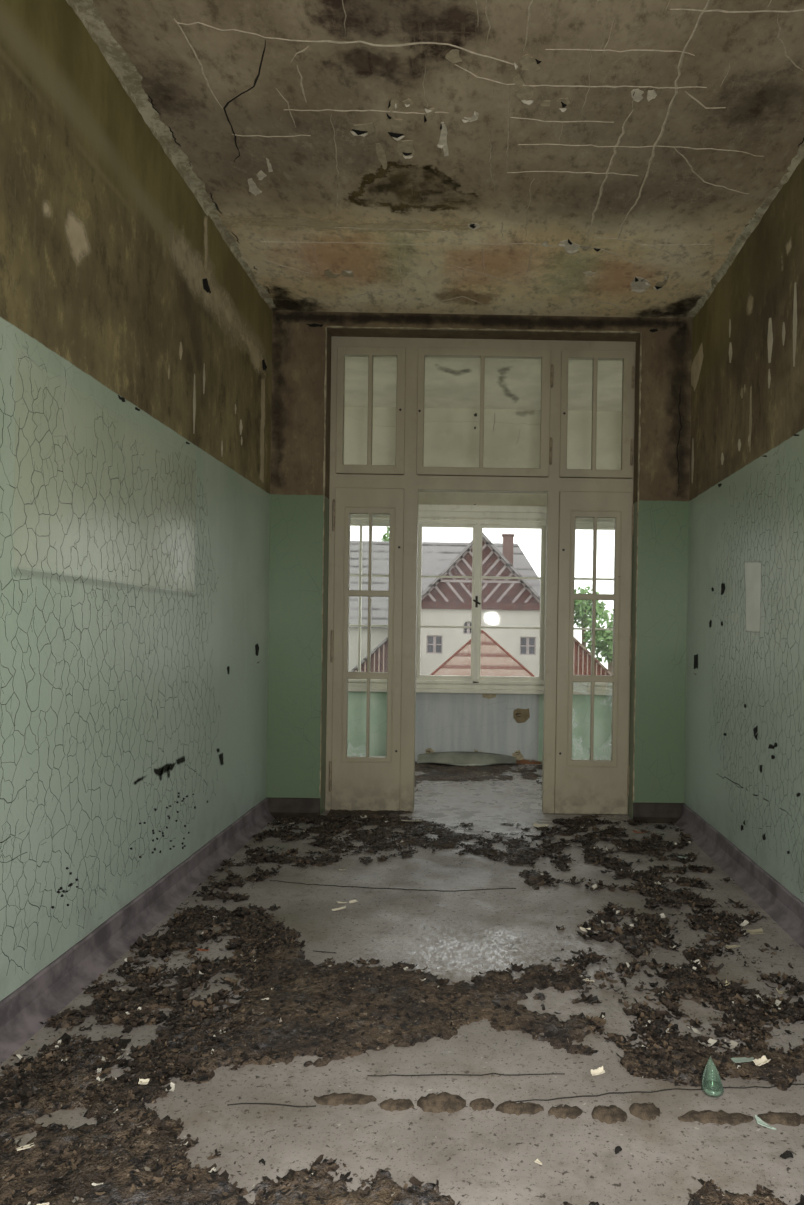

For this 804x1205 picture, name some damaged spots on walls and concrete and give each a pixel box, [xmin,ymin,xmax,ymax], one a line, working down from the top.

water stain [316,0,386,37]
water stain [343,0,482,83]
peeling [350,97,449,170]
water stain [348,161,478,213]
crack [174,0,804,297]
water stain [172,236,704,492]
crack [0,335,221,976]
crack [709,441,804,893]
spalling [753,726,777,773]
spalling [130,792,196,858]